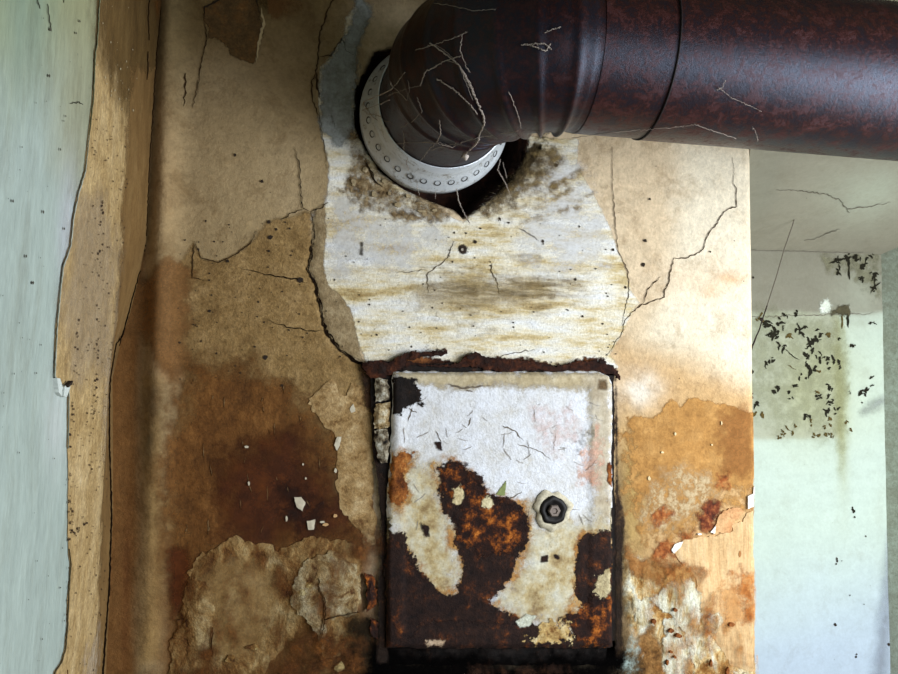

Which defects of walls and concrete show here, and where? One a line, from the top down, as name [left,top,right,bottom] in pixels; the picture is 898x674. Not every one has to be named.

peeling [198,0,266,92]
peeling [53,0,161,674]
crack [102,0,161,674]
water stain [125,212,366,437]
peeling [168,380,377,674]
crack [241,149,363,365]
rust [155,348,626,674]
peeling [309,0,639,369]
crack [605,150,737,356]
water stain [617,398,764,547]
mould [751,305,851,399]
mould [778,383,841,440]